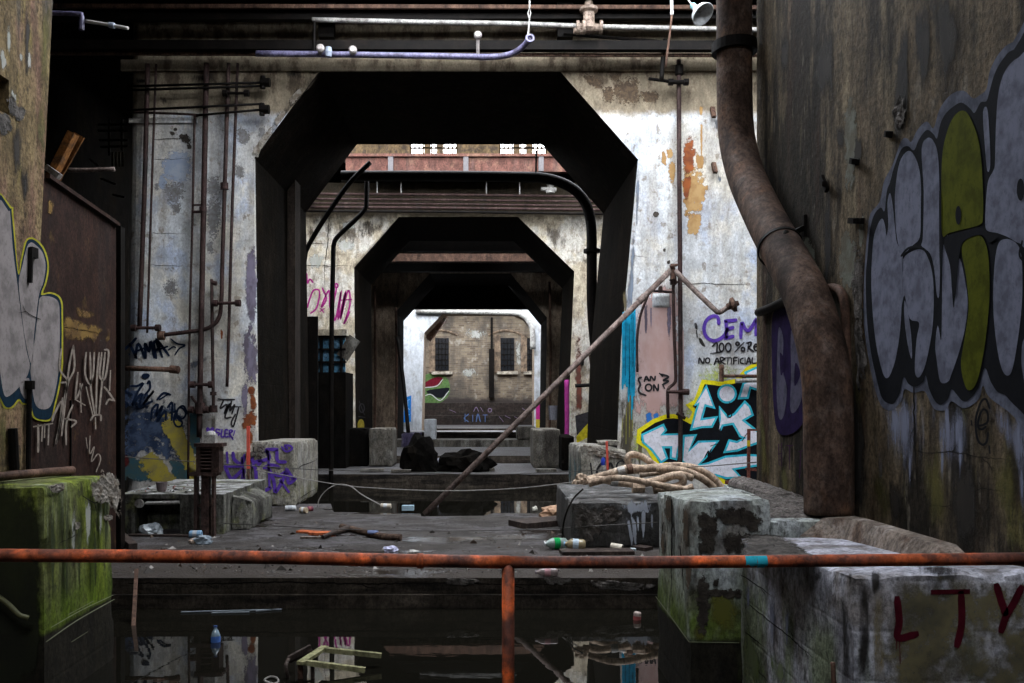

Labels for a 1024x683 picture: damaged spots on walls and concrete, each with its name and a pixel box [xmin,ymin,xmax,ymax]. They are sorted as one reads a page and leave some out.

leakage [0,479,108,549]
spalling [91,472,122,521]
leakage [854,403,902,524]
leakage [928,407,977,543]
leakage [996,415,1024,507]
leakage [0,562,114,683]